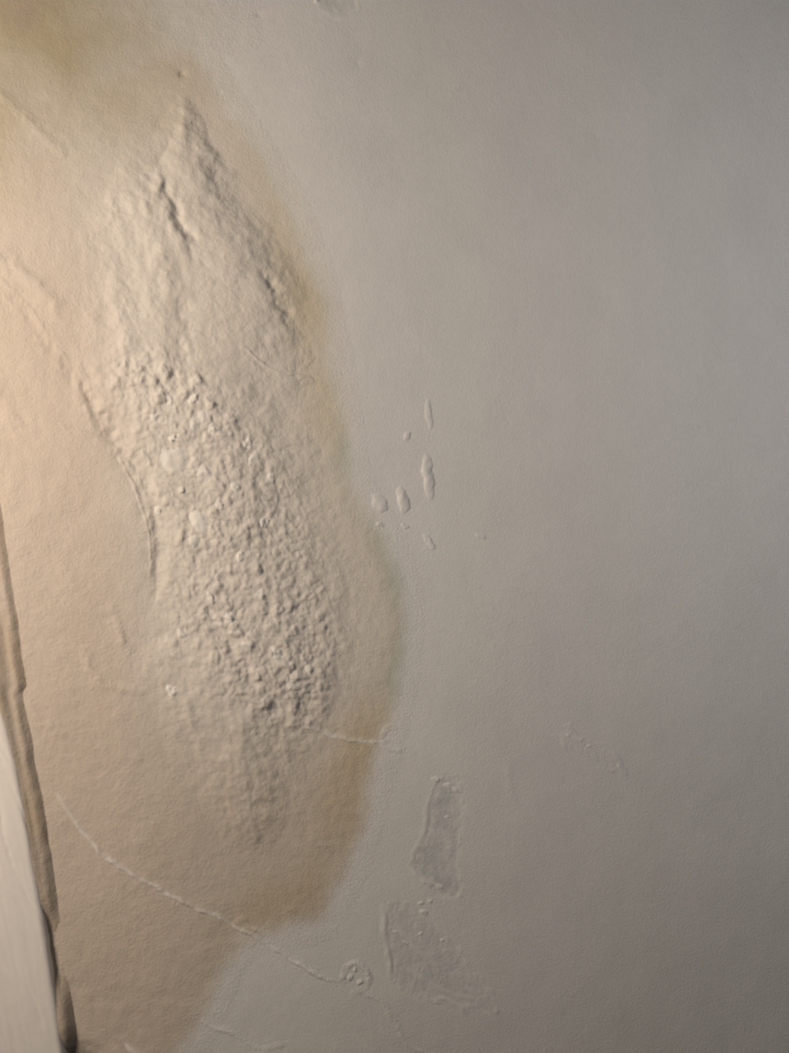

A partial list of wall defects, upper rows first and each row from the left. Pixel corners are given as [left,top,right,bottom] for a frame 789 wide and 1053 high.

leakage [0,0,426,1053]